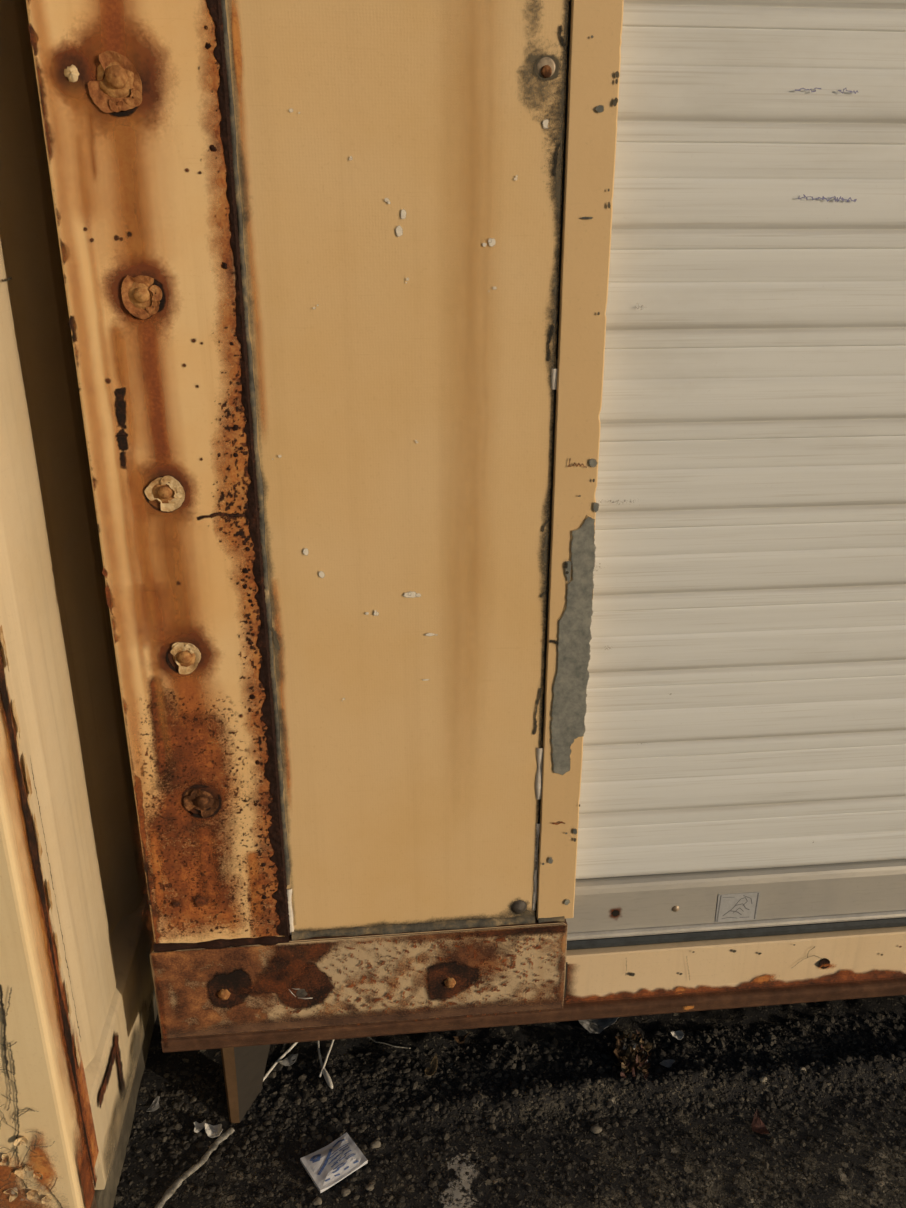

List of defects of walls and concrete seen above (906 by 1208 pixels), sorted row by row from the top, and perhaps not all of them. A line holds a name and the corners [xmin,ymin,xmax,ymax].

corrosion [28,0,242,944]
corrosion [204,0,280,937]
peeling [549,502,599,775]
corrosion [0,697,99,1208]
corrosion [151,925,906,1048]